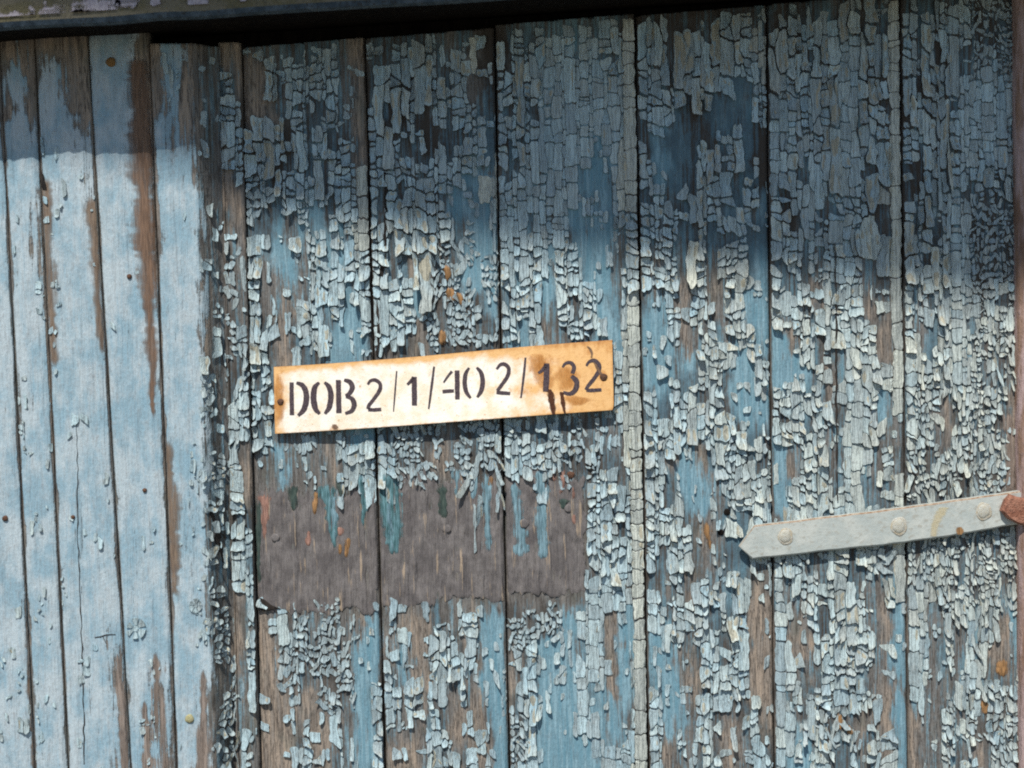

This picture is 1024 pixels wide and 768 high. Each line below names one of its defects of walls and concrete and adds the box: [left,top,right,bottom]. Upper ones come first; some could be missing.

peeling [0,0,161,17]
peeling [43,178,67,235]
corrosion [444,265,463,306]
corrosion [534,360,586,414]
peeling [215,0,1019,768]
peeling [189,221,360,768]